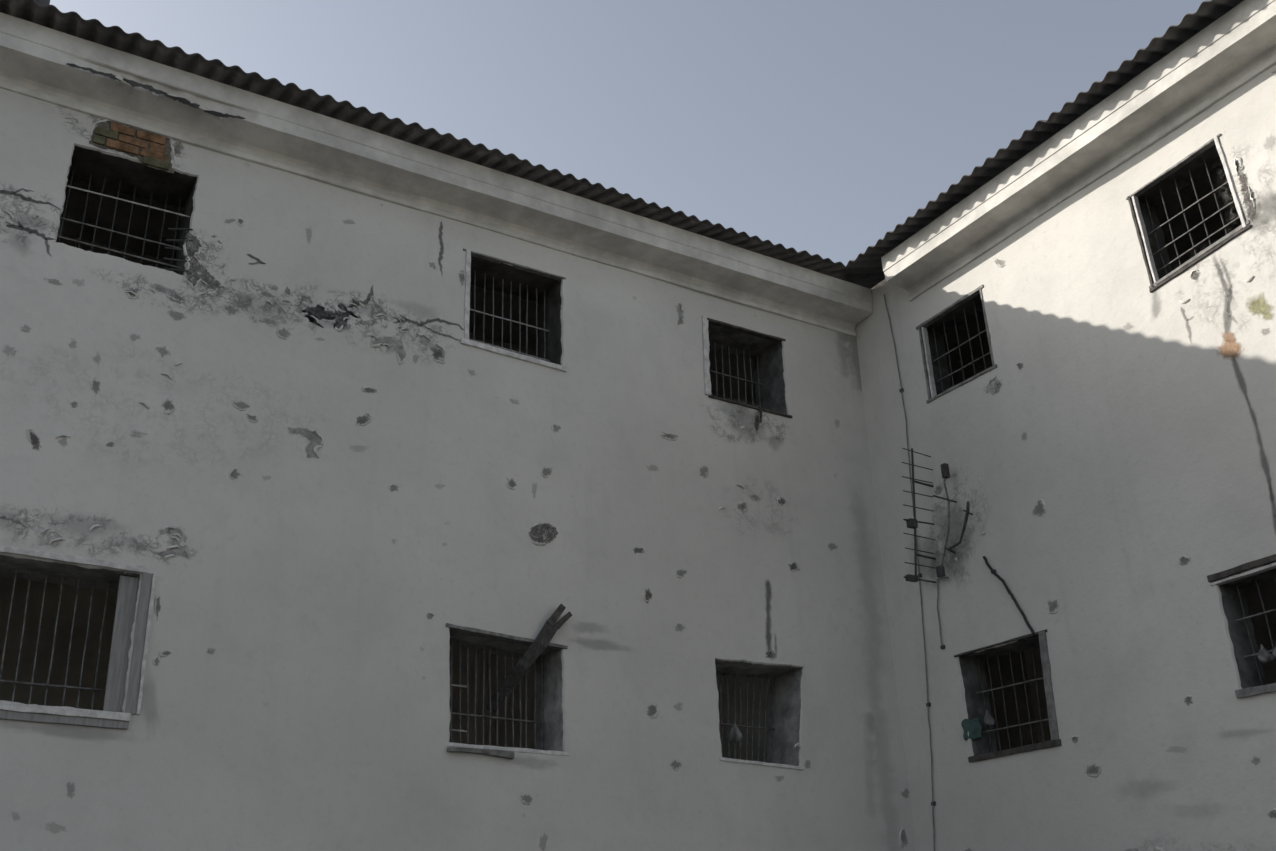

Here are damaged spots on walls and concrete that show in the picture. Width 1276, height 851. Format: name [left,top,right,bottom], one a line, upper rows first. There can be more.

flaking render [68,115,185,173]
crack [0,188,62,240]
flaking render [125,233,237,315]
crack [437,221,445,276]
peeling [334,301,445,365]
rust [1220,332,1240,357]
flaking render [529,522,558,546]